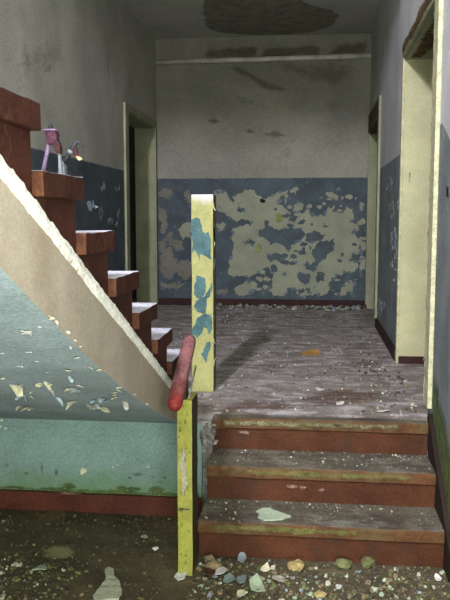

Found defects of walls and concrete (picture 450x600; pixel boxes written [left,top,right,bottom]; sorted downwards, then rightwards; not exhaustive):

leakage [207,48,256,57]
leakage [264,46,319,56]
peeling [87,200,120,227]
peeling [158,207,192,291]
peeling [213,187,366,299]
spalling [199,423,218,453]
leakage [1,483,177,496]